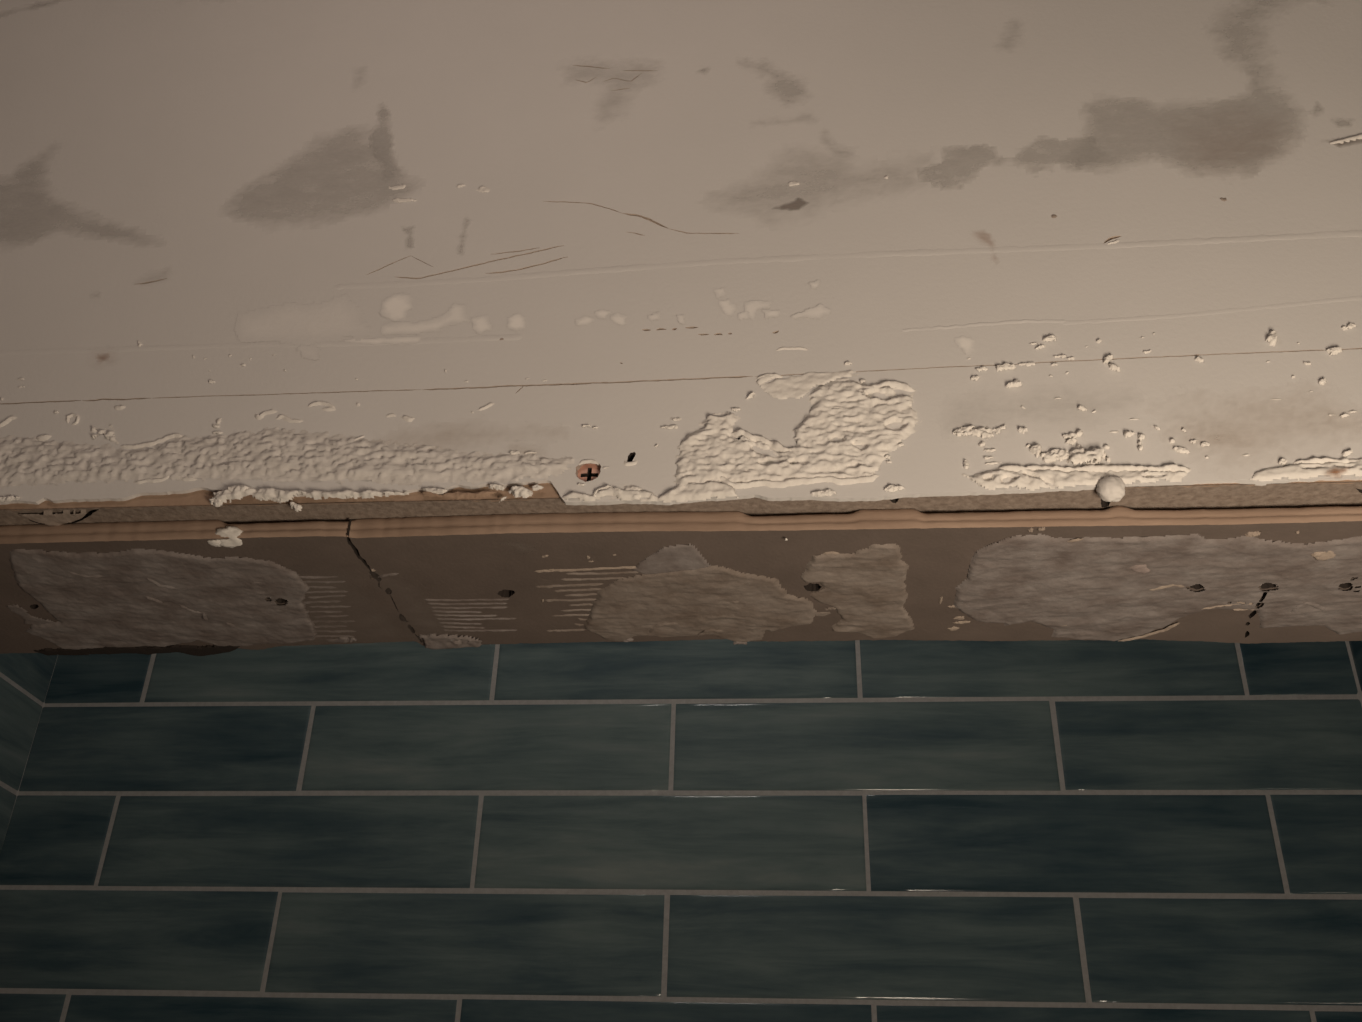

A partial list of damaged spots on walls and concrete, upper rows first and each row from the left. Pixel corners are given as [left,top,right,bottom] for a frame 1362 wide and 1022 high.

flaking render [562,361,923,503]
spalling [209,484,544,512]
crack [347,519,422,642]